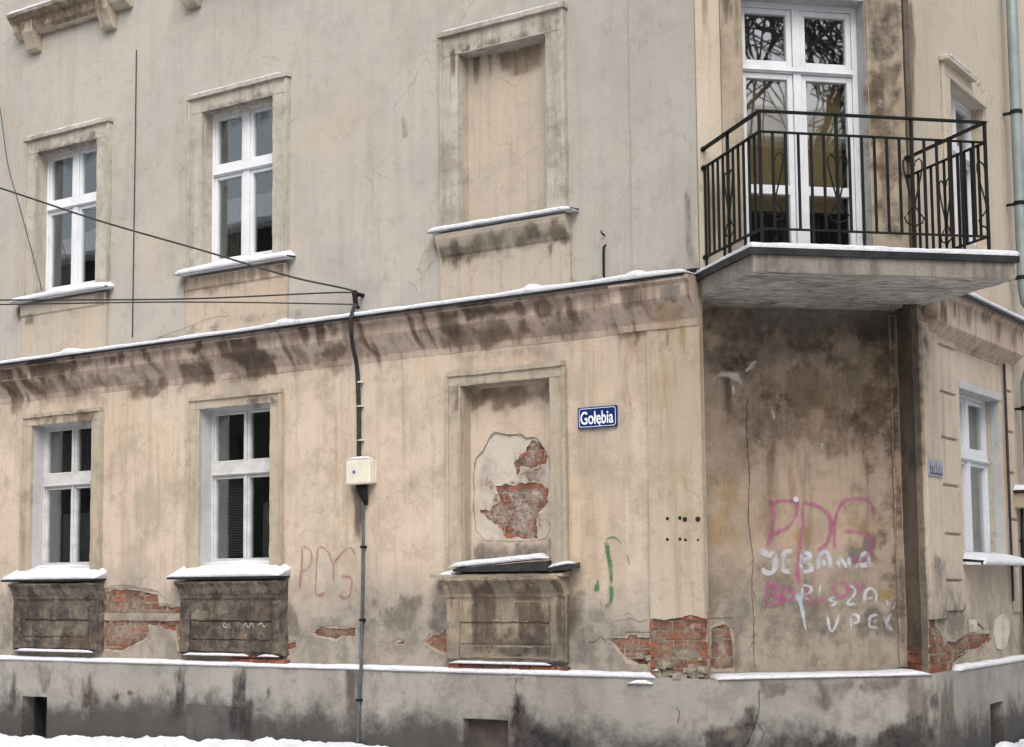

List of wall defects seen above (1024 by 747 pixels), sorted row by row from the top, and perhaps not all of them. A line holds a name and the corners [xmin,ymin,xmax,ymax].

damp [1,356,76,402]
damp [218,337,276,376]
damp [300,323,345,359]
damp [409,298,575,346]
spalling [473,432,551,542]
crack [746,400,757,666]
spalling [93,587,195,654]
spalling [311,625,357,642]
spalling [607,612,735,680]
spalling [898,613,1010,673]
damp [230,673,252,733]
damp [511,698,569,747]